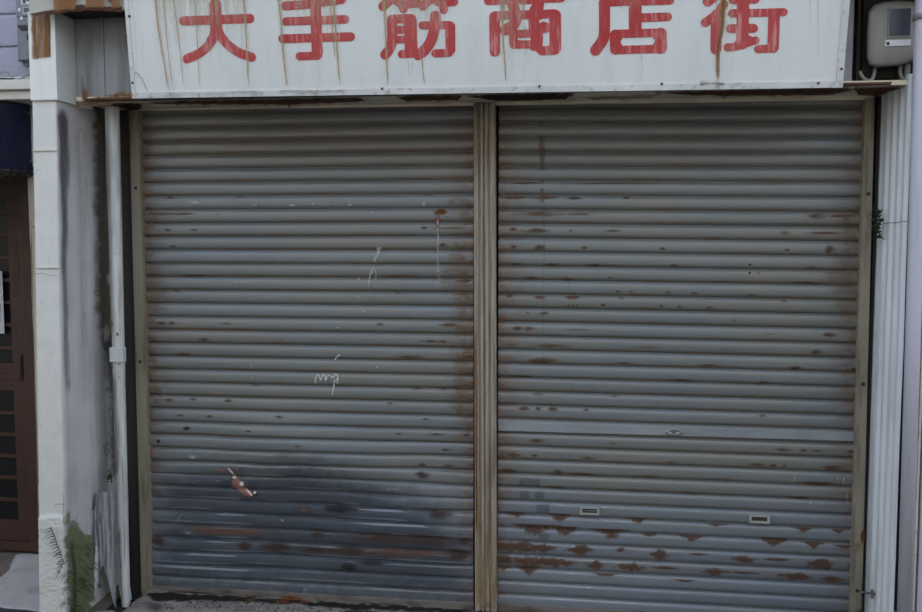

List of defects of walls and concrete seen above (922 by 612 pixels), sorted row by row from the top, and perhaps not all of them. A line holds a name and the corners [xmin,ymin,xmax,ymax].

rust [31,0,122,59]
rust [155,0,183,86]
rust [330,0,340,82]
leakage [58,106,123,473]
rust [303,330,695,601]
rust [703,556,759,576]
rust [761,538,787,546]
rust [777,559,845,582]